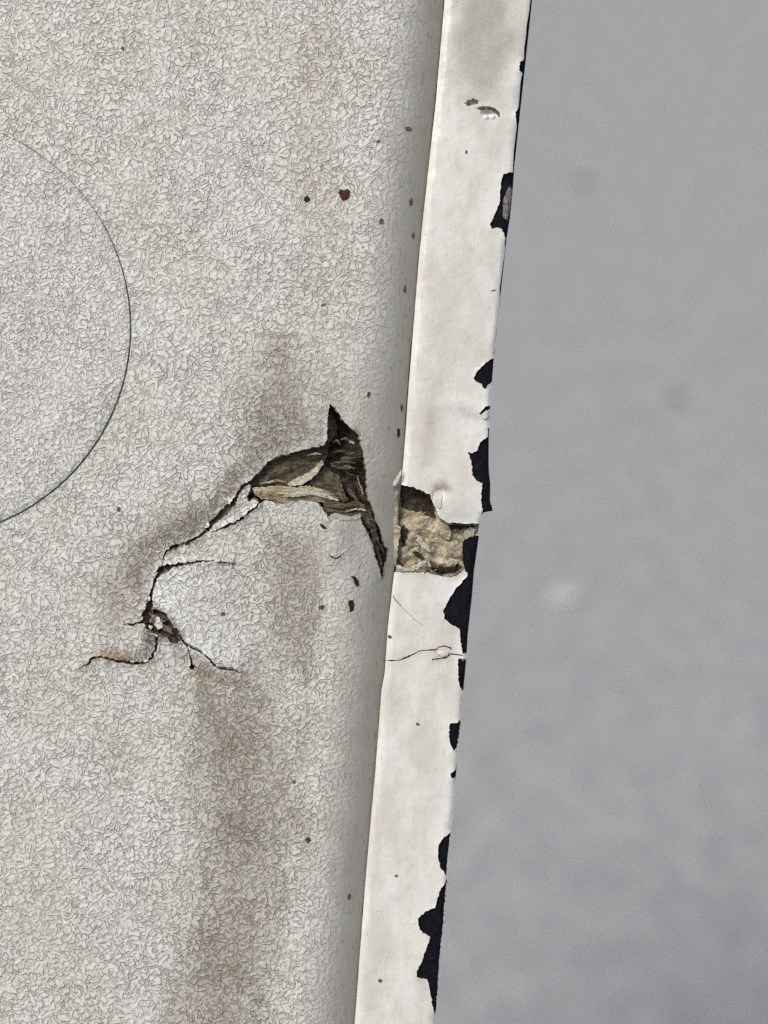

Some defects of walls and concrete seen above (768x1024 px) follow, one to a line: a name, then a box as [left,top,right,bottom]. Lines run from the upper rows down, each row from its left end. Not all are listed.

crack [79,482,263,672]
spalling [293,405,492,690]